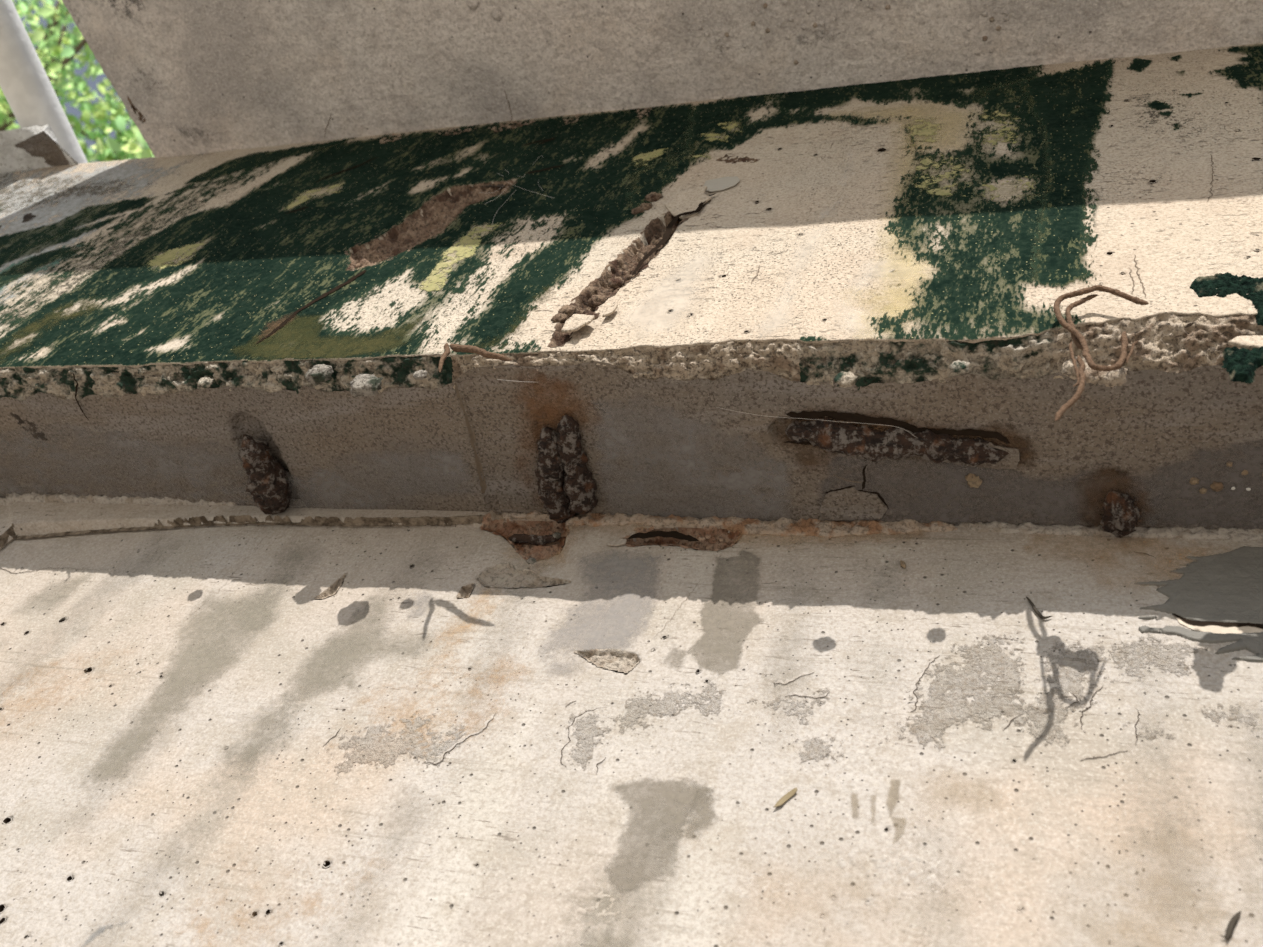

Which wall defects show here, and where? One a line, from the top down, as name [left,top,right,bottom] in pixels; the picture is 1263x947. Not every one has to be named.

spalling [0,313,1263,441]
rust [238,434,293,514]
rust [534,415,598,524]
rust [784,411,1033,469]
rust [1100,491,1141,538]
leakage [97,601,272,777]
leakage [554,553,655,650]
spalling [574,649,640,673]
leakage [690,551,761,673]
leakage [603,781,714,903]